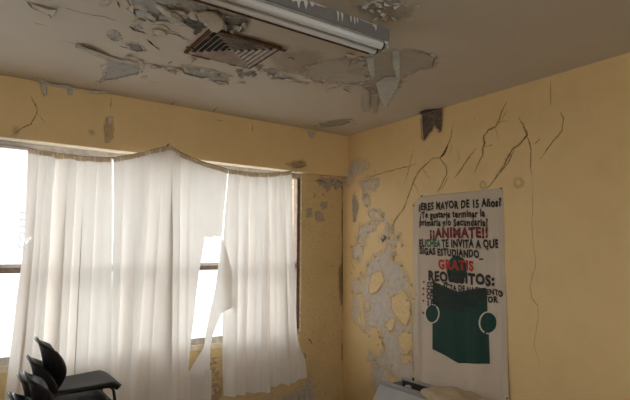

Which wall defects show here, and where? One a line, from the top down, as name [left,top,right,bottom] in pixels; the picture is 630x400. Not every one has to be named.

peeling [127,0,250,36]
peeling [360,0,412,22]
peeling [38,29,300,96]
peeling [363,51,401,114]
flaking render [420,108,443,141]
crack [365,104,506,235]
crack [486,113,564,189]
peeling [299,157,417,393]